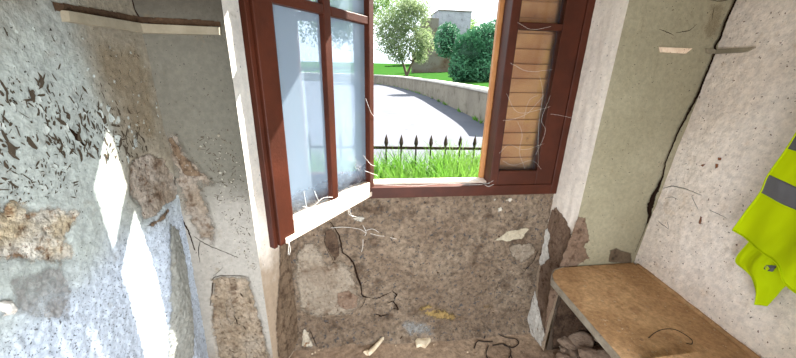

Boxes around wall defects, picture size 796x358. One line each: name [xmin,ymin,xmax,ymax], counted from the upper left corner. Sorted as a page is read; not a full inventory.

crack [635,0,737,252]
spalling [210,266,270,358]
peeling [302,329,318,347]
spalling [295,229,370,323]
crack [324,222,391,307]
peeling [479,207,589,348]